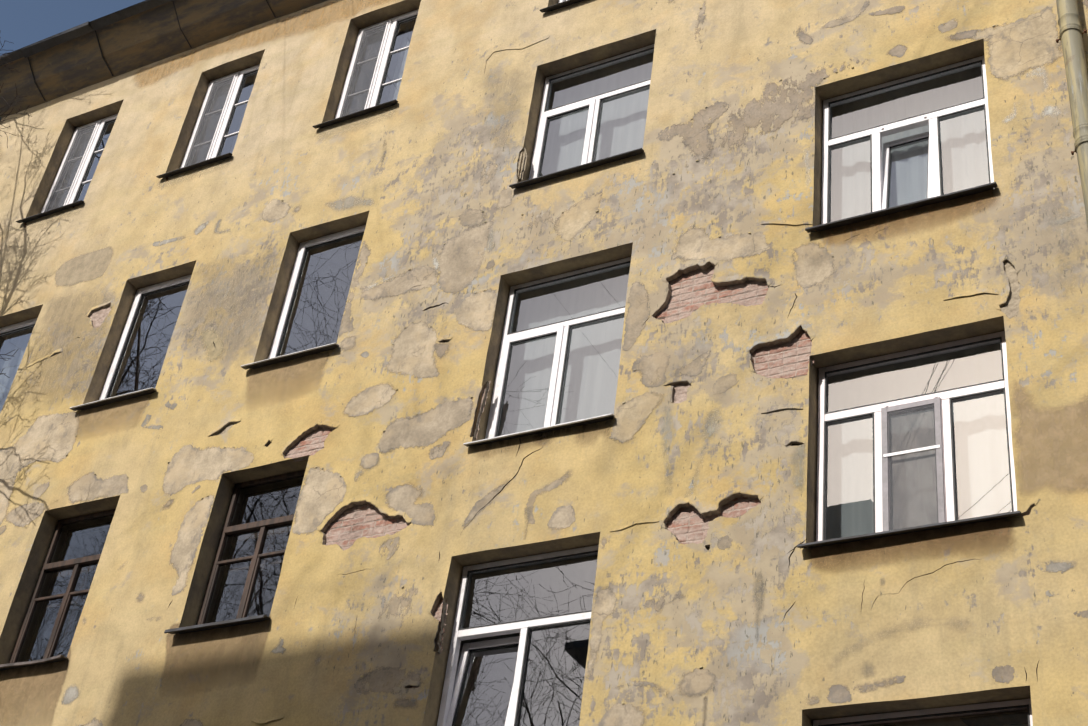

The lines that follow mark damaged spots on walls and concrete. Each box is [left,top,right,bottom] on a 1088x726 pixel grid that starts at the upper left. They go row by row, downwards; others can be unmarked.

peeling [797,28,813,45]
peeling [823,0,905,28]
peeling [656,60,860,167]
spalling [609,227,772,443]
spalling [712,318,815,394]
peeling [0,411,80,535]
spalling [162,381,490,596]
crack [460,437,545,535]
spalling [658,485,764,550]
crack [861,559,979,609]